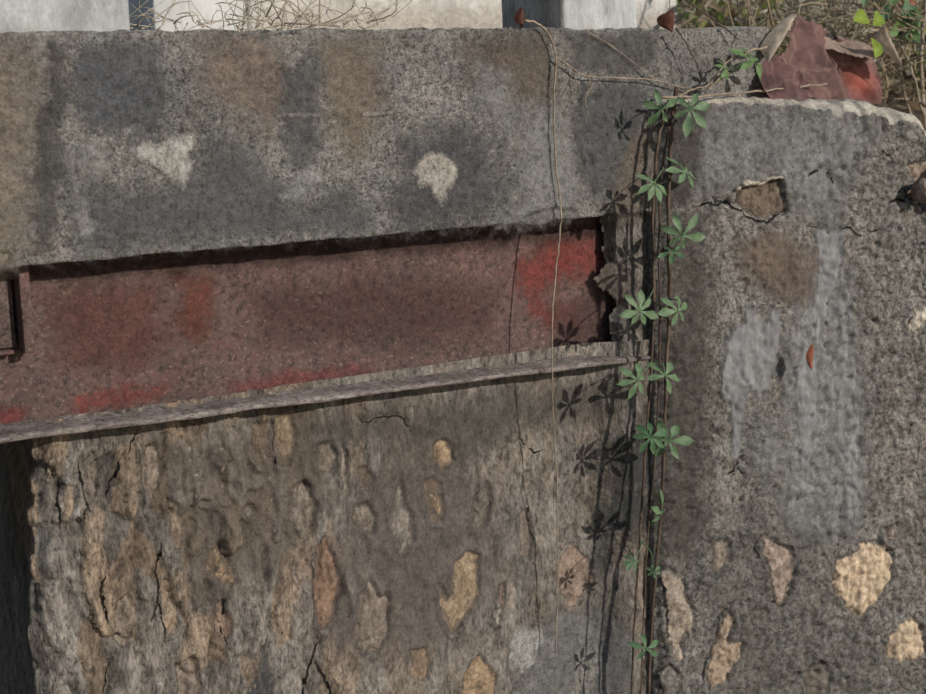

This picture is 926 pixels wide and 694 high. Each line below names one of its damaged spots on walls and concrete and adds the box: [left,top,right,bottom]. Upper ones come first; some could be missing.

water stain [568,33,656,73]
water stain [392,121,505,232]
water stain [515,103,575,217]
corrosion [70,224,602,274]
peeling [517,238,630,302]
water stain [795,346,820,481]
crack [56,434,137,532]
crack [151,545,166,644]
crack [302,554,332,694]
flaking render [706,614,741,689]
flaking render [759,534,795,608]
flaking render [831,526,899,616]